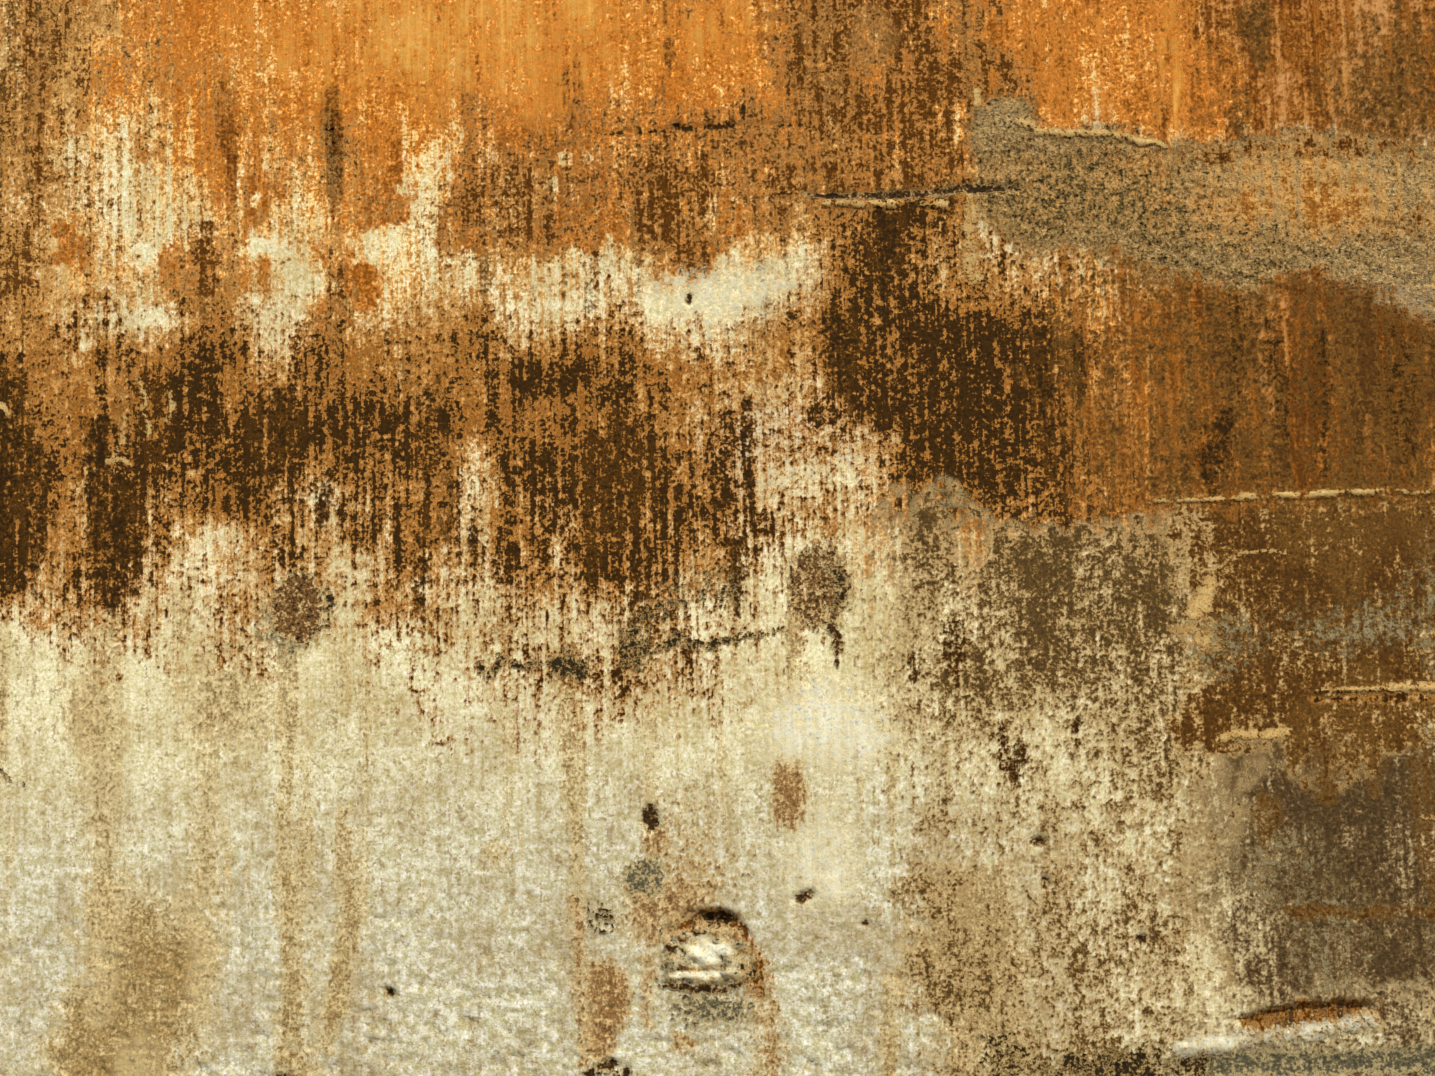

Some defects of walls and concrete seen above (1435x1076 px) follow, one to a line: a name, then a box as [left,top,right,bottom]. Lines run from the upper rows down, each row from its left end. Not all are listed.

corrosion [0,0,1435,643]
spalling [957,86,1435,330]
water stain [1230,1063,1275,1076]
crack [1173,994,1387,1062]